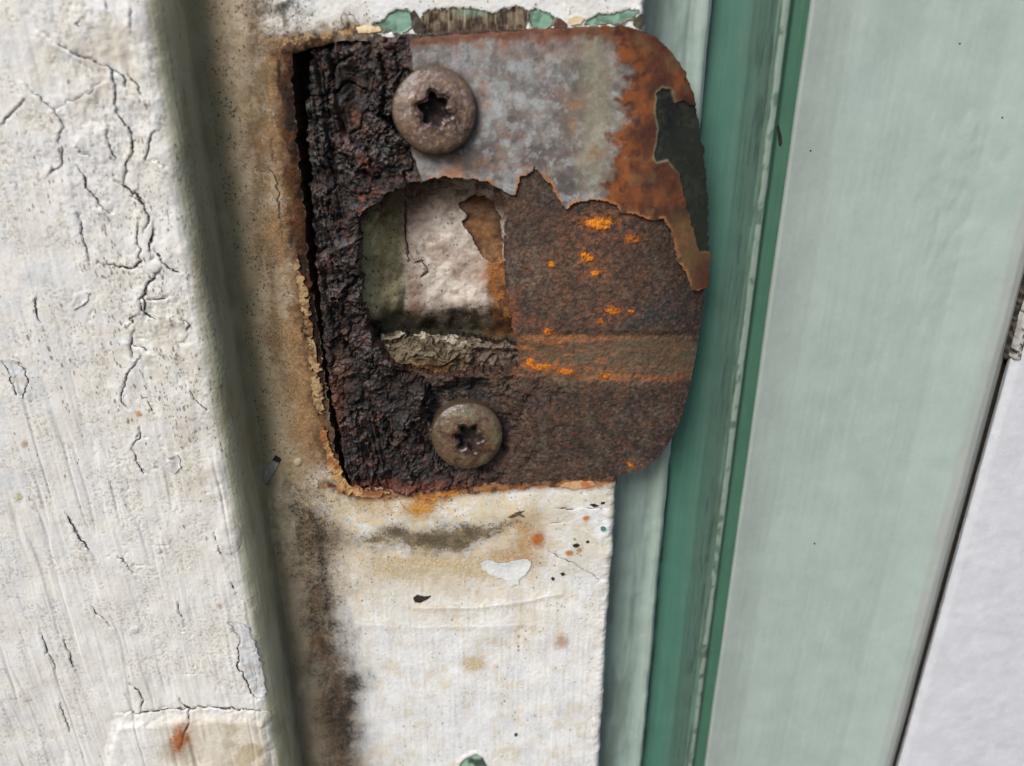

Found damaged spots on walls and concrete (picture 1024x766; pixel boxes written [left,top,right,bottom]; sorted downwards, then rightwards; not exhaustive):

peeling [356,5,645,35]
crack [264,142,287,235]
rust [584,217,613,230]
crack [4,25,190,474]
rust [245,2,574,517]
rust [579,252,599,276]
rust [598,306,634,325]
crack [67,516,89,549]
peeling [480,558,531,586]
leakage [280,481,543,766]
crack [127,624,270,730]
rust [166,723,192,752]